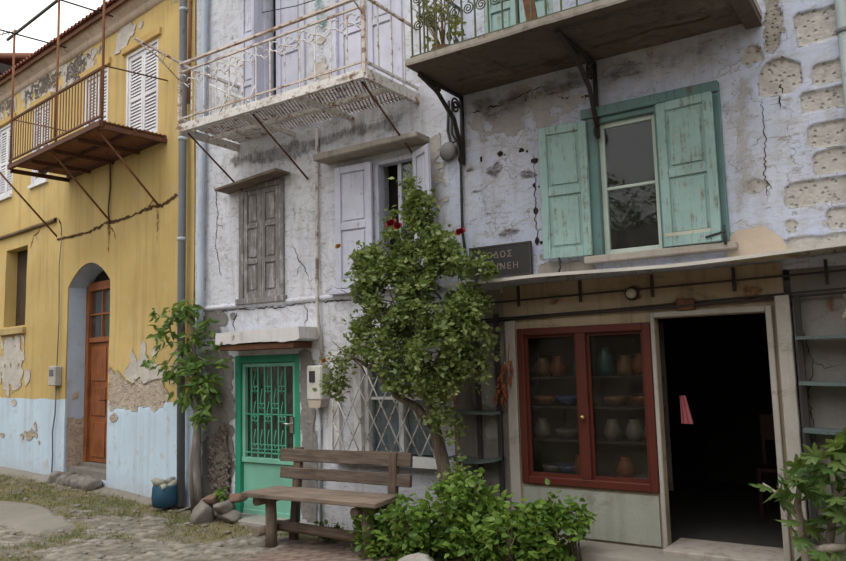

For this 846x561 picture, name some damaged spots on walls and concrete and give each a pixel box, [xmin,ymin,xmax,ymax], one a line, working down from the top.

peeling [113,20,143,55]
peeling [0,48,97,121]
flaking render [736,0,845,195]
crack [751,84,783,197]
flaking render [781,118,846,257]
peeling [0,334,30,406]
spalling [108,340,177,422]